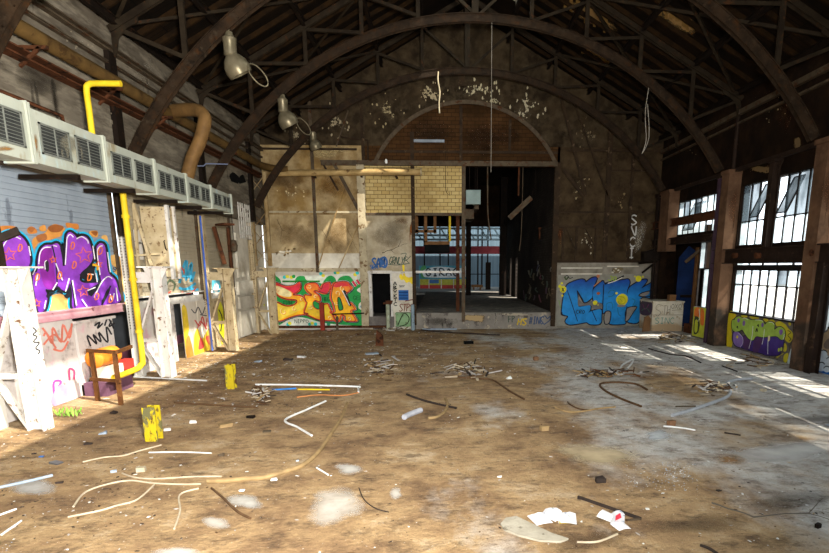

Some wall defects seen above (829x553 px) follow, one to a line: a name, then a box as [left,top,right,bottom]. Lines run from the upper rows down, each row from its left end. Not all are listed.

flaking render [419,82,448,108]
flaking render [459,78,546,119]